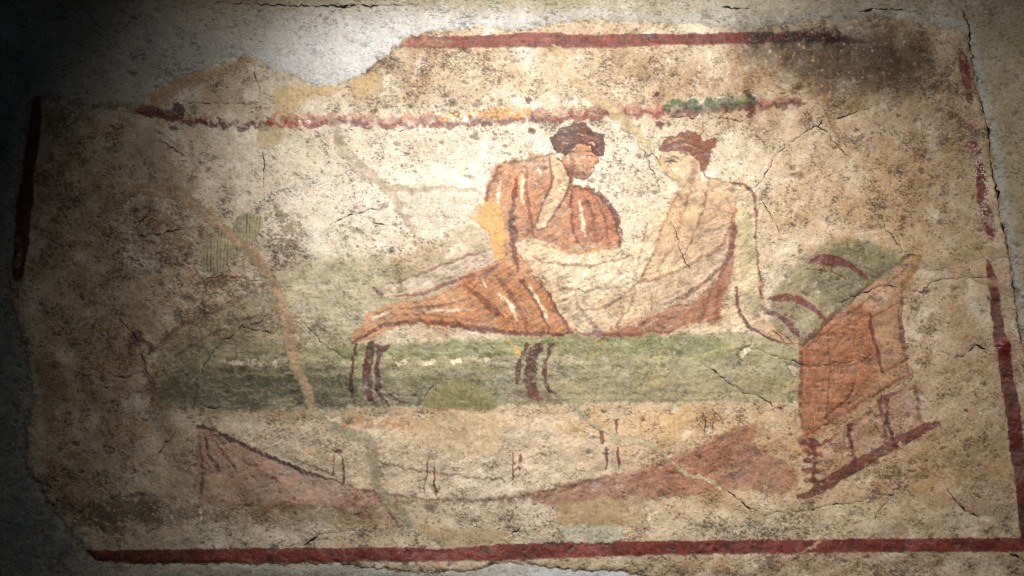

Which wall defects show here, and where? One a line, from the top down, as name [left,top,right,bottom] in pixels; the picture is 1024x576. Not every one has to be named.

crack [127,181,414,532]
crack [756,106,867,231]
damp [719,2,954,116]
crack [842,7,1023,358]